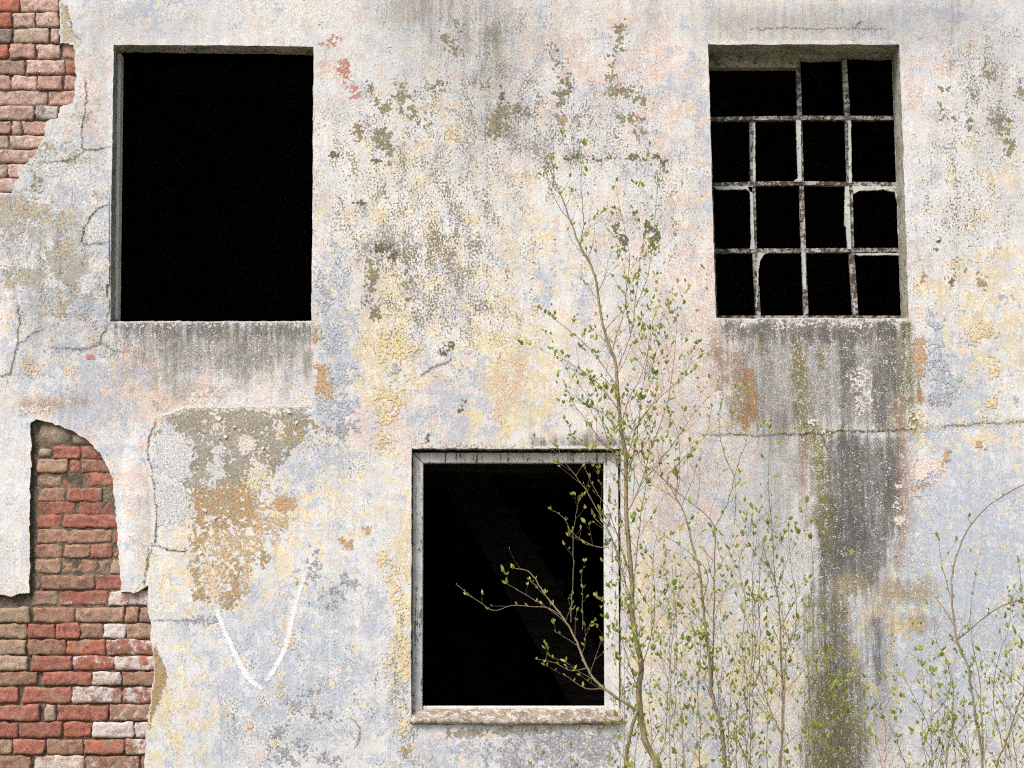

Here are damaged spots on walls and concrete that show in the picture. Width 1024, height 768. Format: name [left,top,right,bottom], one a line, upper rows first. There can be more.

crack [38,80,110,163]
flaking render [0,0,110,323]
crack [80,205,107,245]
peeling [19,354,95,378]
crack [1,304,126,377]
damp [125,321,311,366]
peeling [146,241,555,612]
crack [710,415,912,450]
crack [944,420,1024,428]
damp [699,319,1023,768]
flaking render [0,403,168,768]